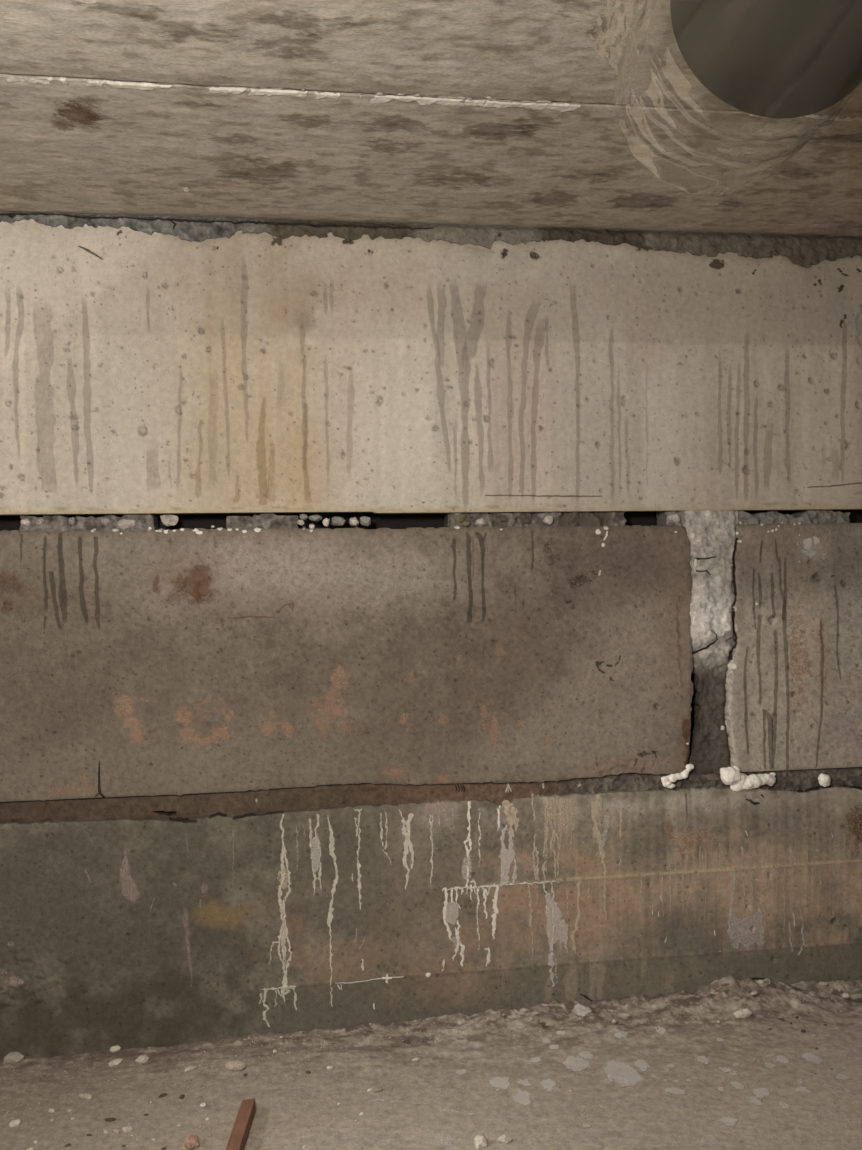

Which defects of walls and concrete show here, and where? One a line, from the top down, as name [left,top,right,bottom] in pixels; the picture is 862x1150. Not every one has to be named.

water stain [43,529,100,628]
water stain [148,526,261,534]
crack [692,538,738,660]
water stain [259,808,404,1027]
water stain [380,794,626,987]